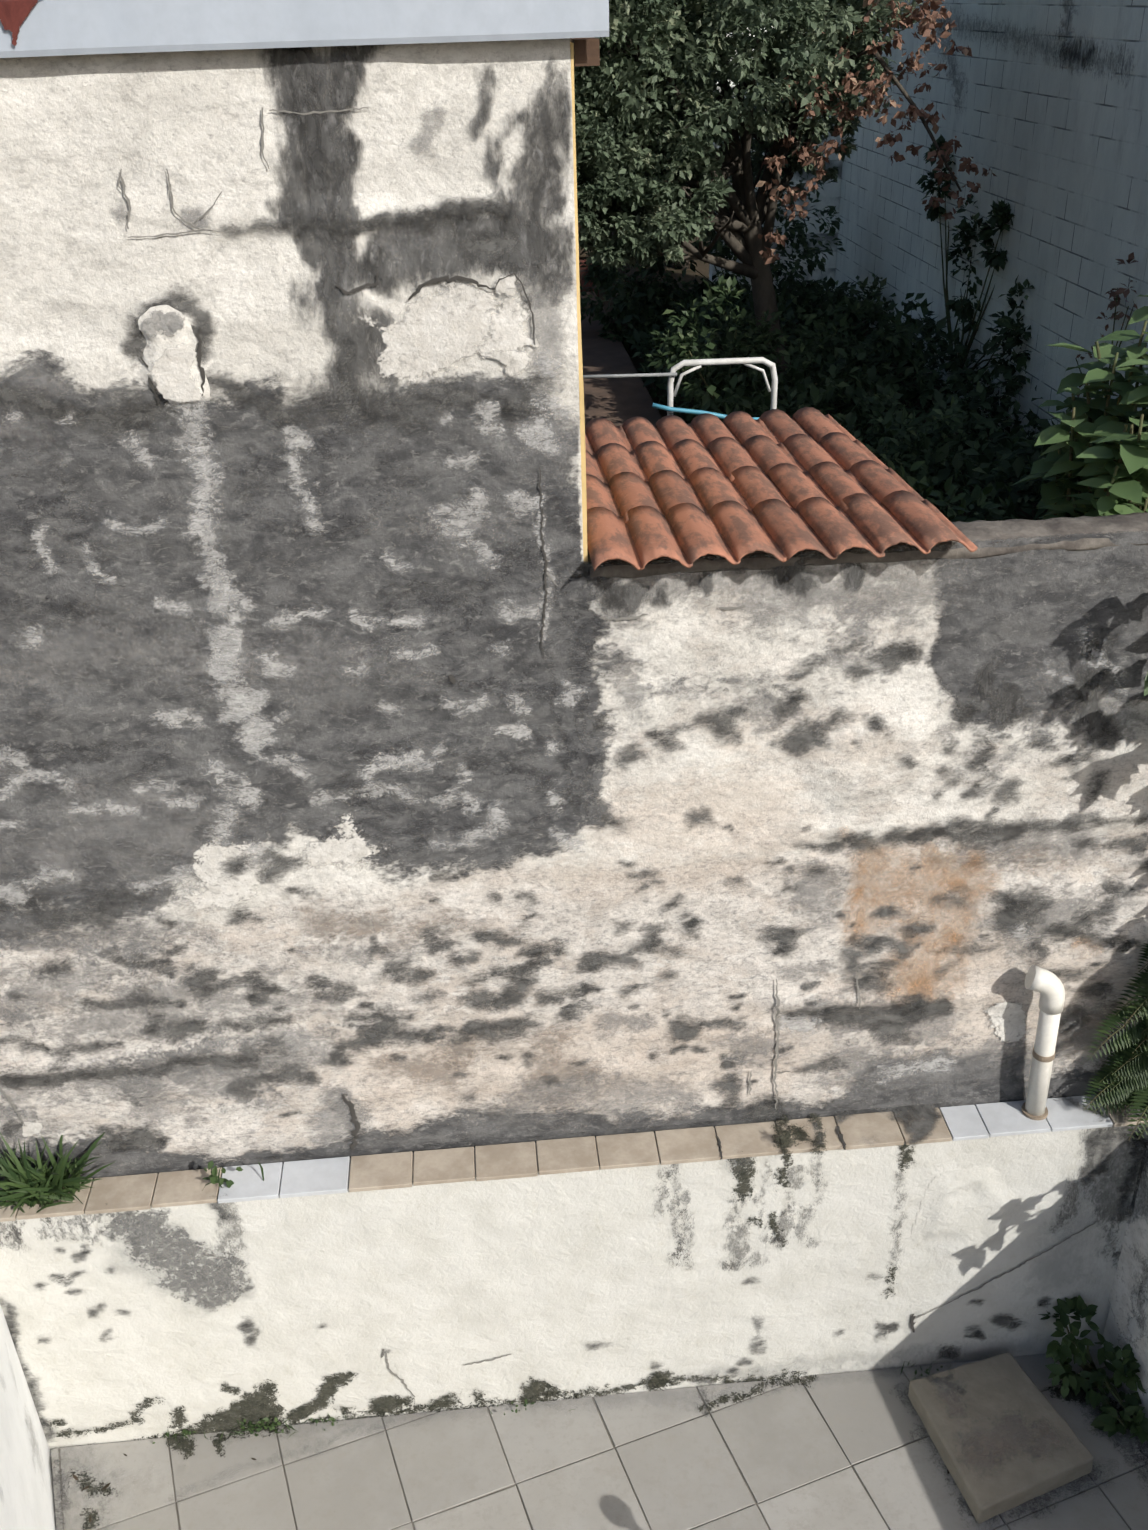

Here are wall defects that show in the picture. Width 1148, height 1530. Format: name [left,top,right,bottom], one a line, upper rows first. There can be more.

crack [261,107,369,169]
crack [118,169,222,238]
peeling [142,310,185,344]
peeling [360,273,557,383]
peeling [476,394,568,452]
peeling [283,426,323,531]
damp [0,45,746,1054]
damp [698,531,1148,870]
damp [288,888,681,1101]
corrosion [844,906,935,998]
crack [342,1094,361,1151]
damp [725,1104,942,1268]